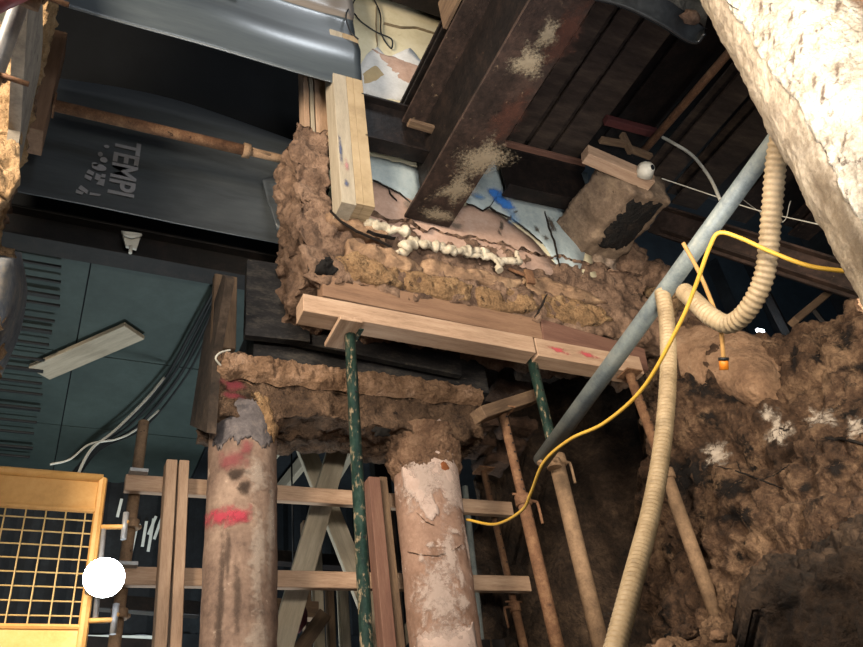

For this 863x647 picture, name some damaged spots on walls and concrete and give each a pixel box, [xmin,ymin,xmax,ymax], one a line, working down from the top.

spalling [275,156,648,341]
spalling [359,335,446,352]
spalling [636,316,660,360]
spalling [217,351,347,443]
spalling [358,353,591,407]
crack [407,544,463,557]
peeling [416,528,478,647]